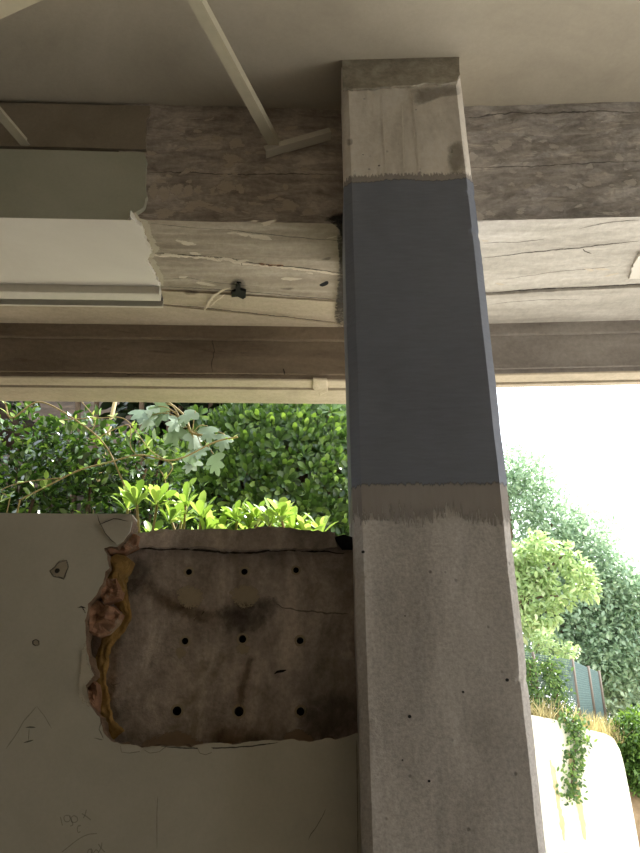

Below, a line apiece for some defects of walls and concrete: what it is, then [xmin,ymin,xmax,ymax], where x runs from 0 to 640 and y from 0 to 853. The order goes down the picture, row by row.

crack [469,110,638,118]
crack [485,220,637,304]
crack [140,546,344,554]
spalling [78,515,365,753]